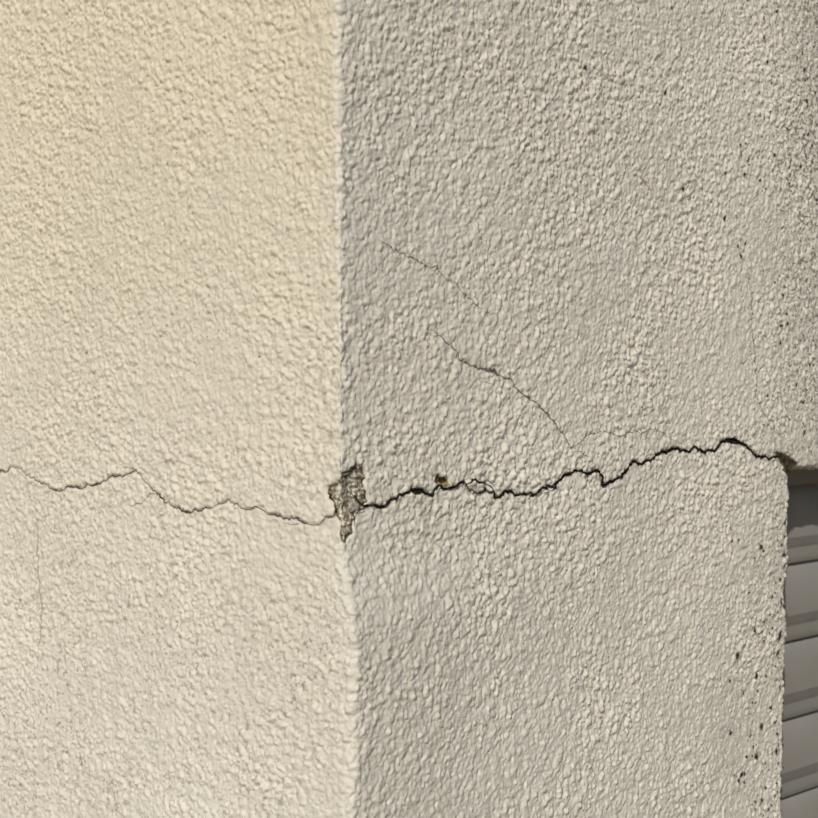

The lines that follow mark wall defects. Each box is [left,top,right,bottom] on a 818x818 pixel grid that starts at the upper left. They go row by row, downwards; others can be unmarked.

crack [383,242,494,315]
crack [0,269,779,526]
flaking render [328,464,367,543]